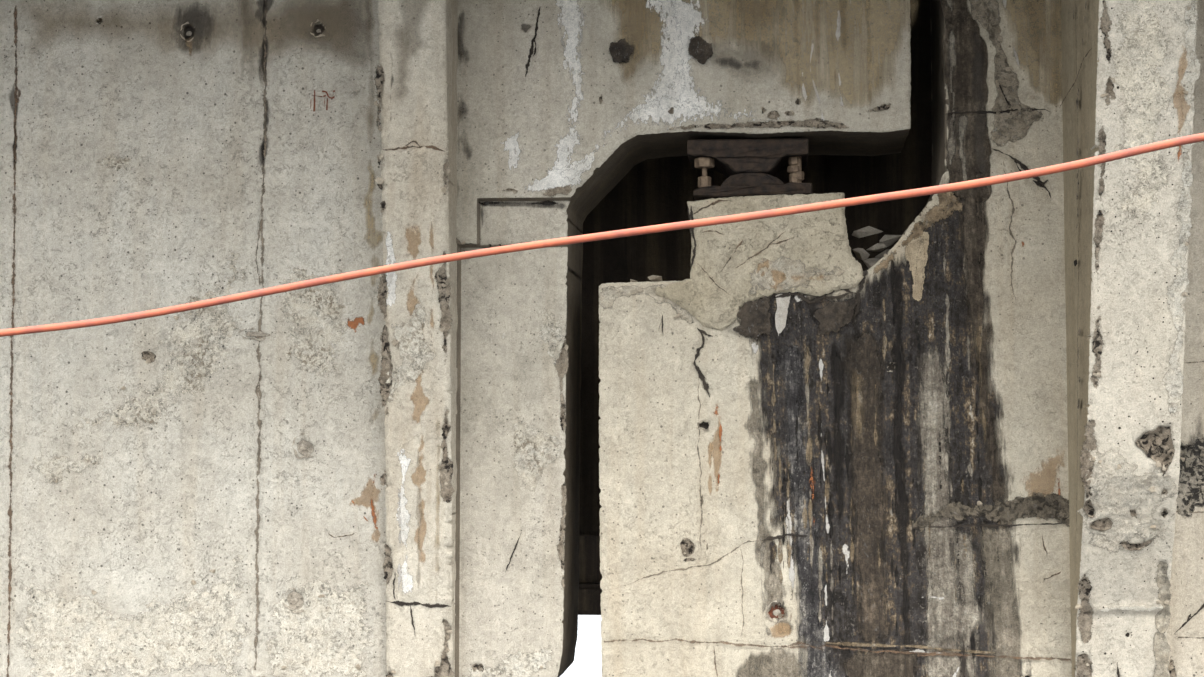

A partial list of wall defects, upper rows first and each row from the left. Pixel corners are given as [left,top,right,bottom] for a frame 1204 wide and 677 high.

crack [945,49,1091,126]
spalling [377,273,398,415]
spalling [435,238,465,362]
water stain [737,0,1030,677]
spalling [873,192,963,301]
crack [993,149,1051,299]
spalling [1078,306,1104,389]
crack [604,328,1077,677]
spalling [1077,420,1178,554]
peeling [15,555,252,677]
peeling [263,580,378,677]
spalling [1075,574,1093,677]